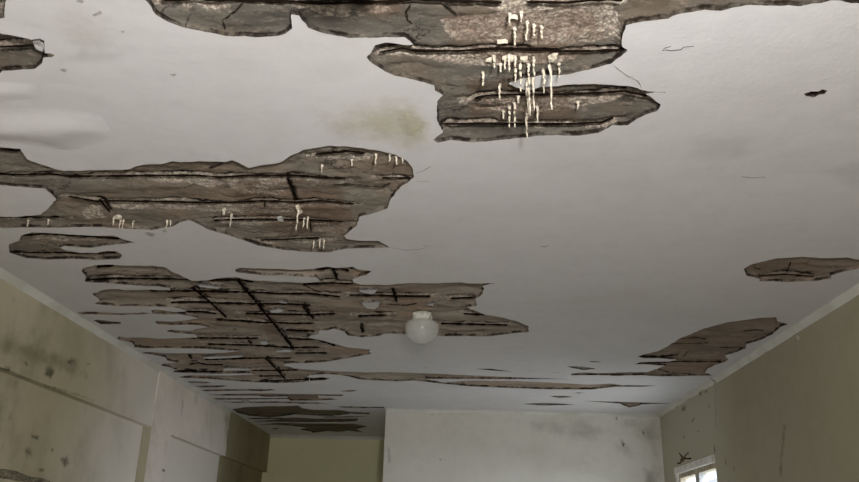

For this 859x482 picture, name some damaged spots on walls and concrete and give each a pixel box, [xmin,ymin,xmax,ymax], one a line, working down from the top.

spalling [0,33,55,73]
spalling [146,0,859,143]
spalling [0,146,787,433]
spalling [744,257,859,282]